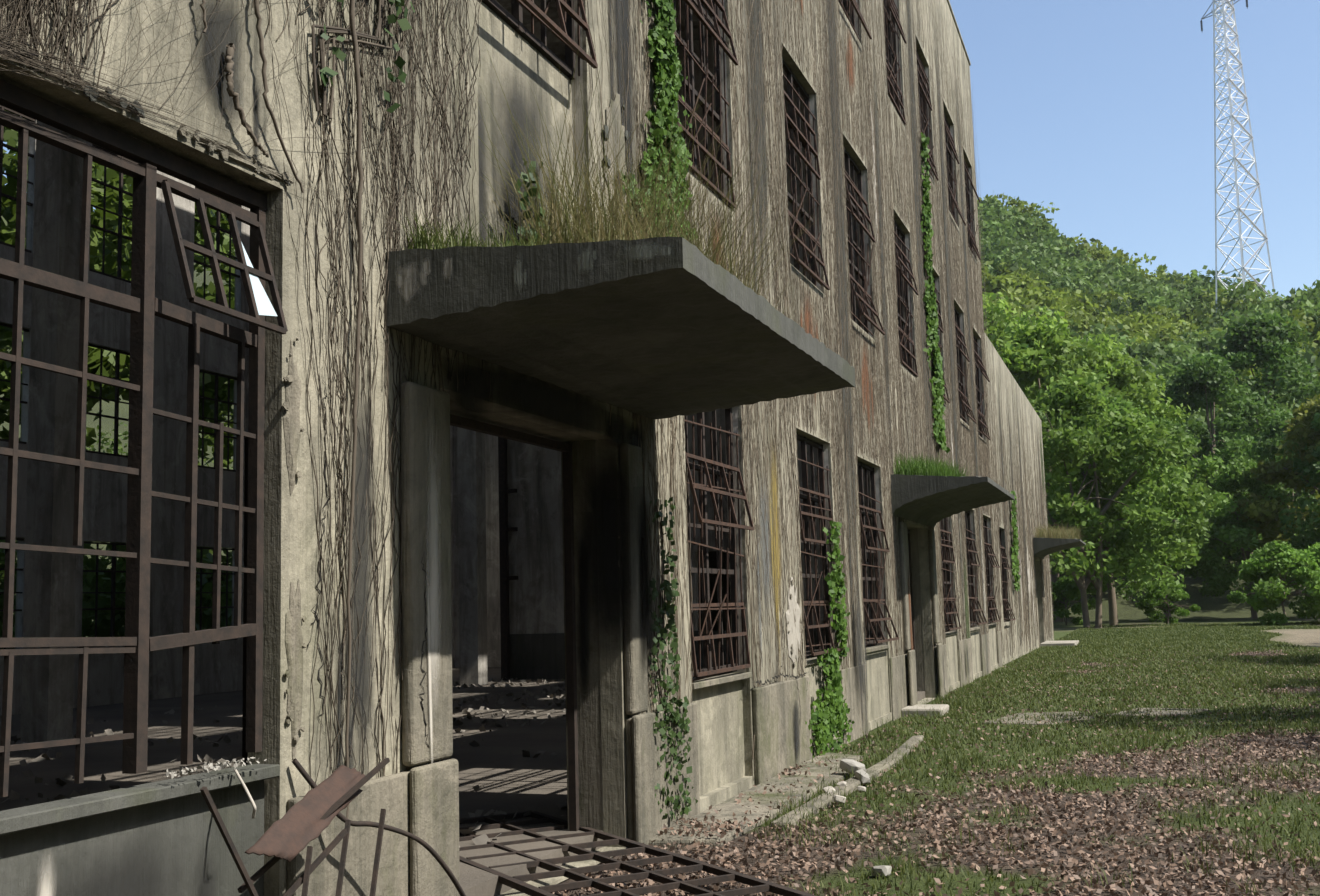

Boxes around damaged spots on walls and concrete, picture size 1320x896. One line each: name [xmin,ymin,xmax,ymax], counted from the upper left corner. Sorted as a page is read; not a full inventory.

damp [579,539,589,692]